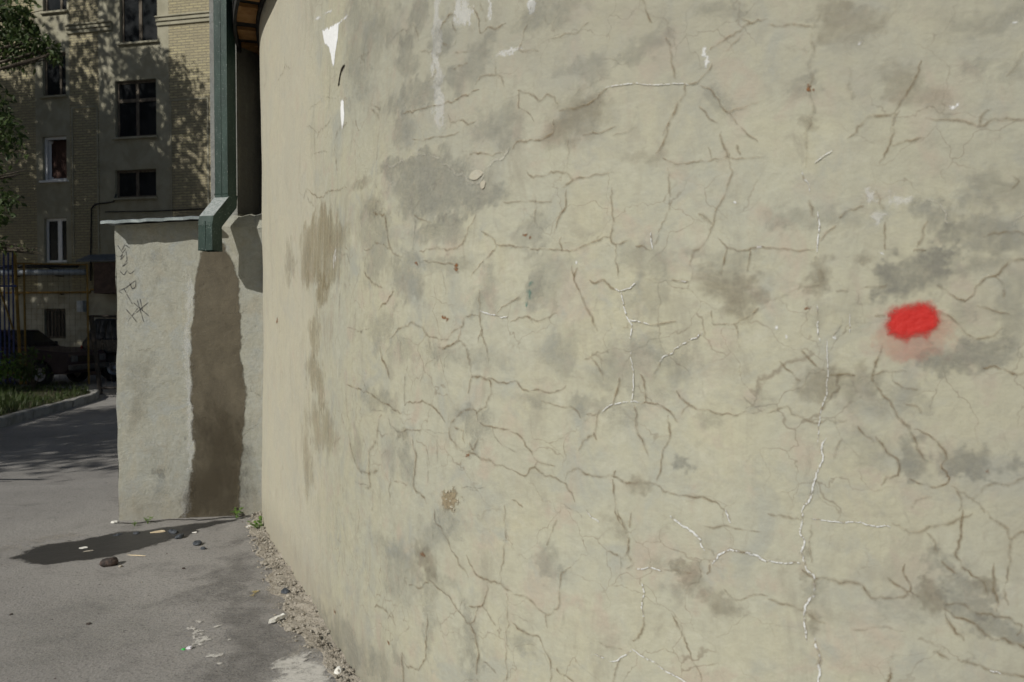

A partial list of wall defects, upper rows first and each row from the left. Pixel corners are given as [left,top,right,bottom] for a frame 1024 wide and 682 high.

water stain [11,243,247,564]
spalling [441,486,459,511]
crack [536,246,701,434]
crack [584,472,685,682]
crack [670,305,889,682]